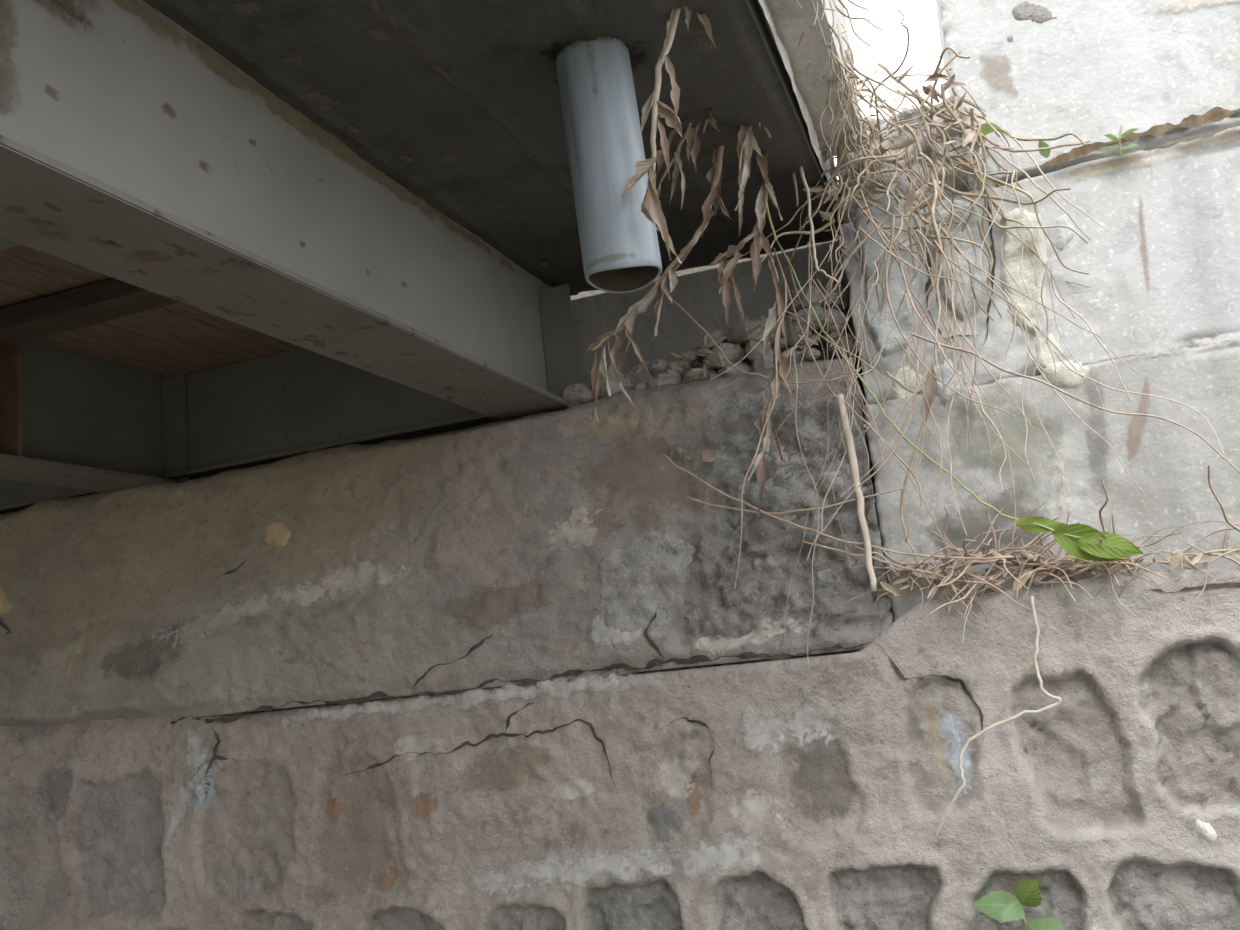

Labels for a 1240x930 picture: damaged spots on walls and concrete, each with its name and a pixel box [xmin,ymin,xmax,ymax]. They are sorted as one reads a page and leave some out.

spalling [264,521,291,547]
crack [1133,582,1240,593]
crack [170,457,983,805]